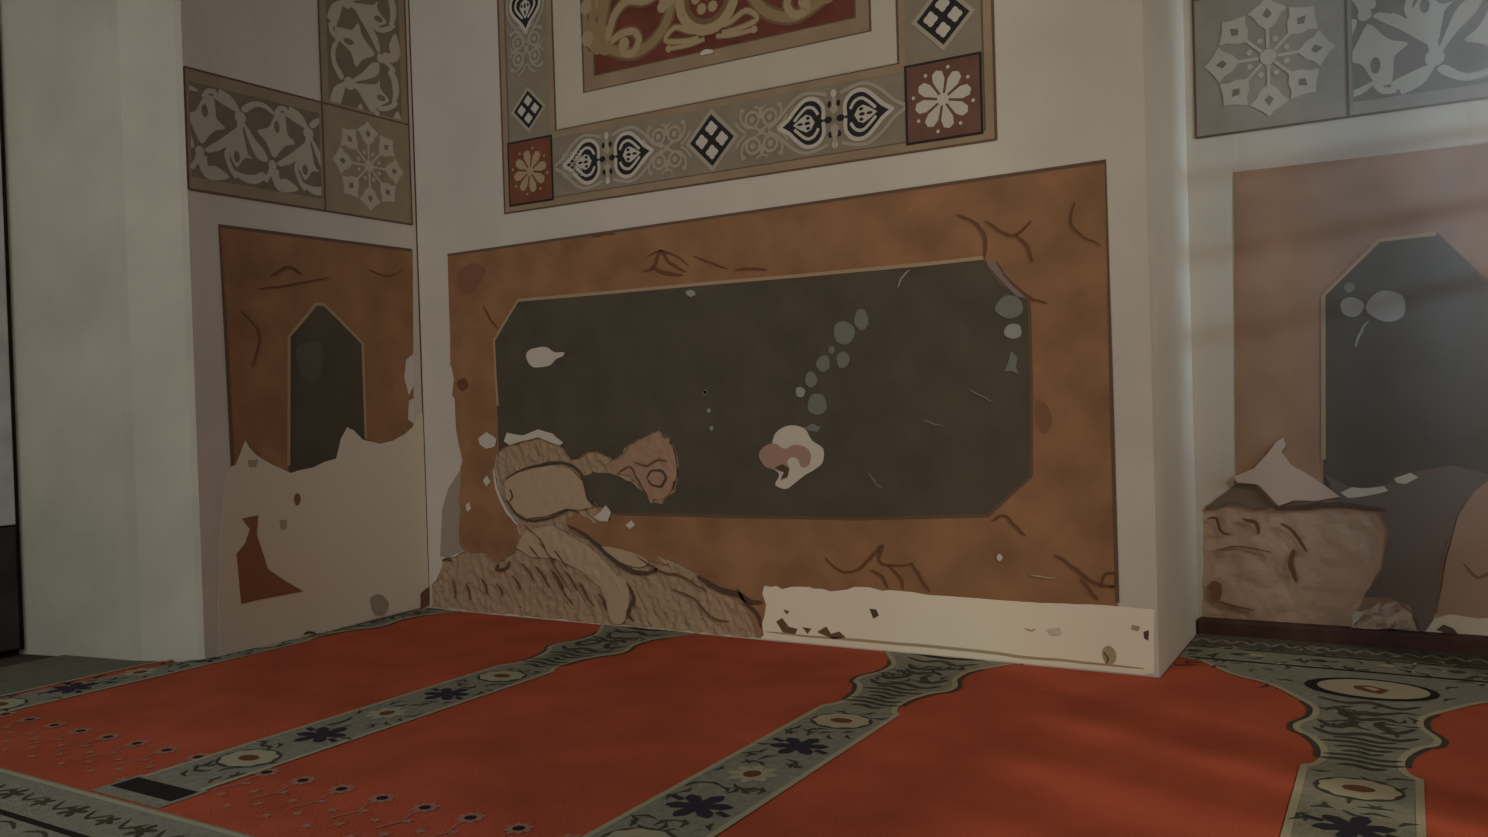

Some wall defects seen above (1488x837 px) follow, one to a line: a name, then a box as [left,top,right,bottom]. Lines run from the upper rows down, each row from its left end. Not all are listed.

crack [957,214,1048,304]
crack [1070,202,1100,245]
peeling [216,354,1154,675]
spalling [1202,438,1488,636]